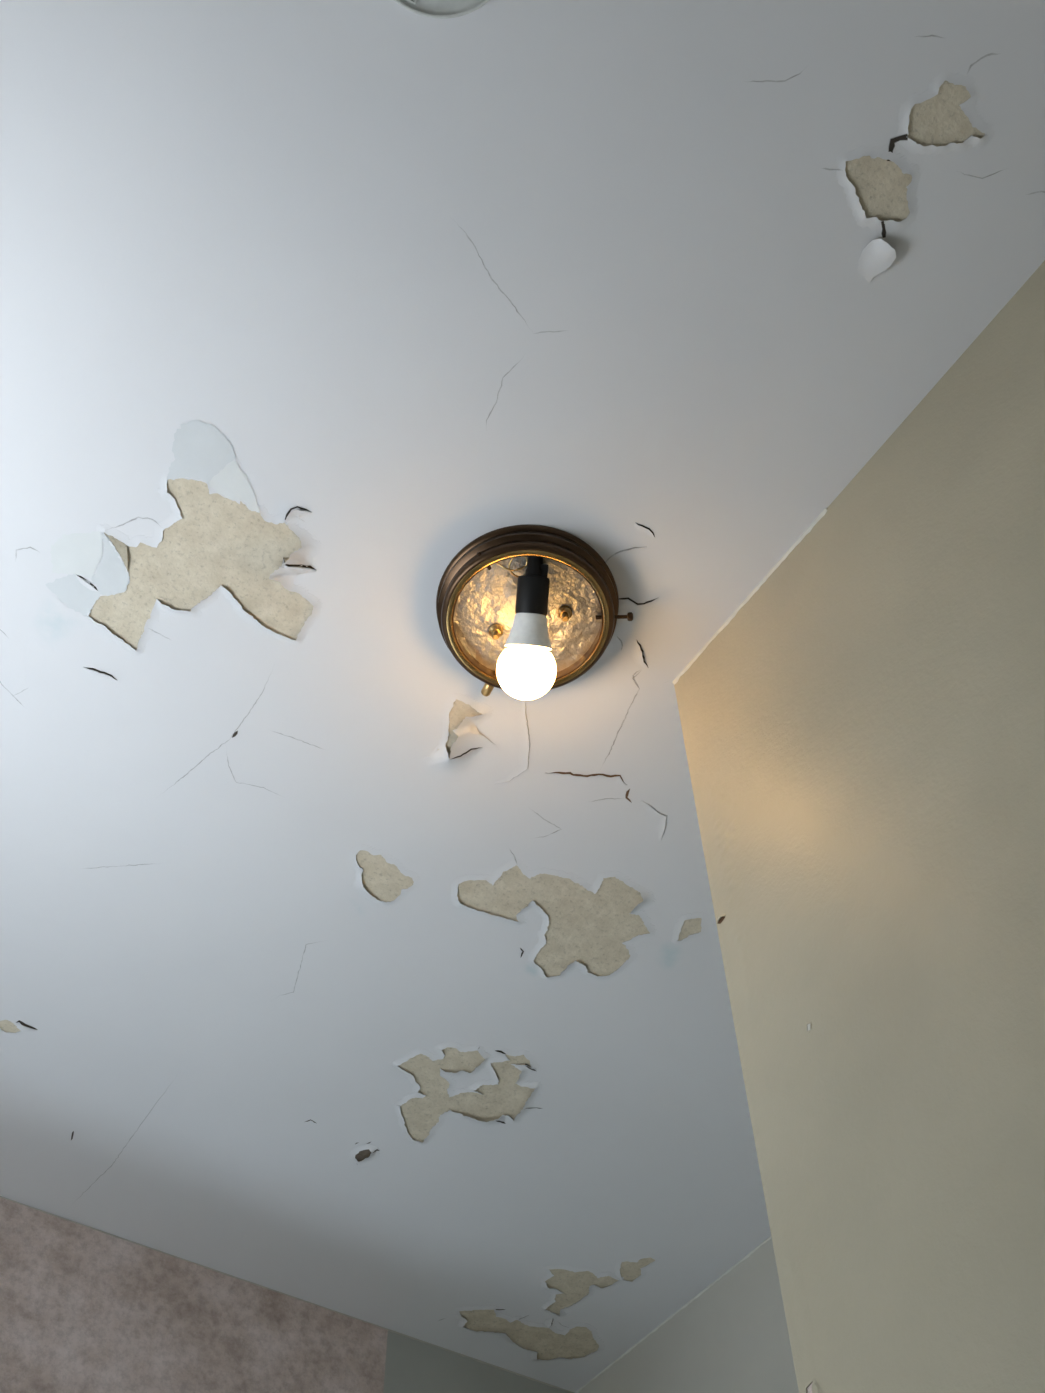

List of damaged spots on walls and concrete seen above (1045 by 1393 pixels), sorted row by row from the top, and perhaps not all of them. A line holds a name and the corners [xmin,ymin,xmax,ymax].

peeling [835,69,995,283]
peeling [45,420,323,657]
peeling [420,692,499,782]
crack [545,772,667,841]
peeling [349,844,421,907]
peeling [450,859,709,981]
peeling [391,1041,543,1145]
peeling [453,1253,661,1362]